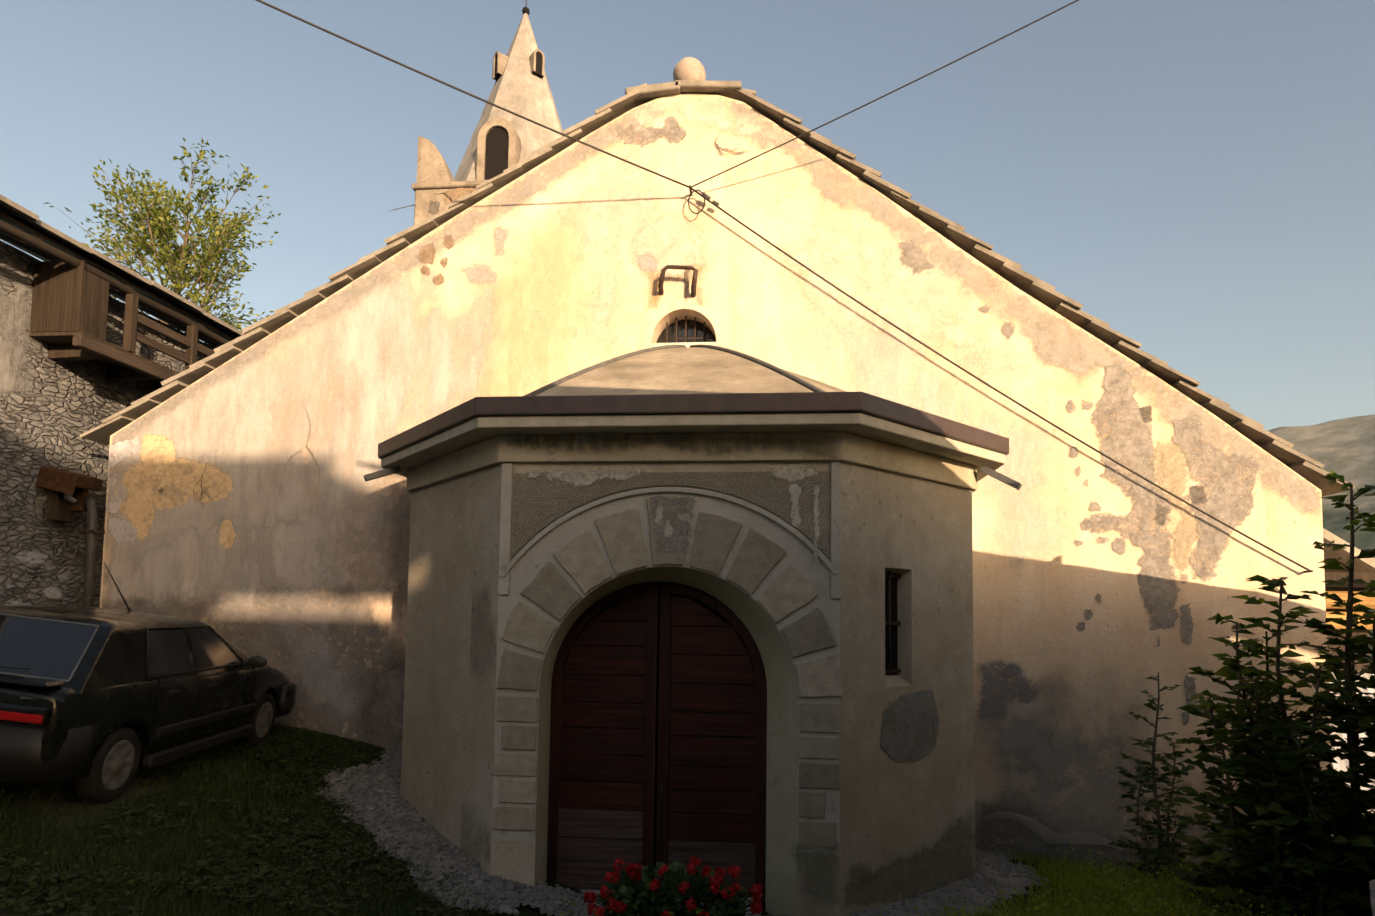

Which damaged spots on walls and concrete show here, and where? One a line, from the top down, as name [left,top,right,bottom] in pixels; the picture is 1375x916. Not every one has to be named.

spalling [417,235,453,285]
leakage [106,104,657,751]
flaking render [106,434,234,545]
crack [193,462,211,509]
flaking render [218,518,236,549]
flaking render [1066,364,1258,646]
leakage [798,661,1240,905]